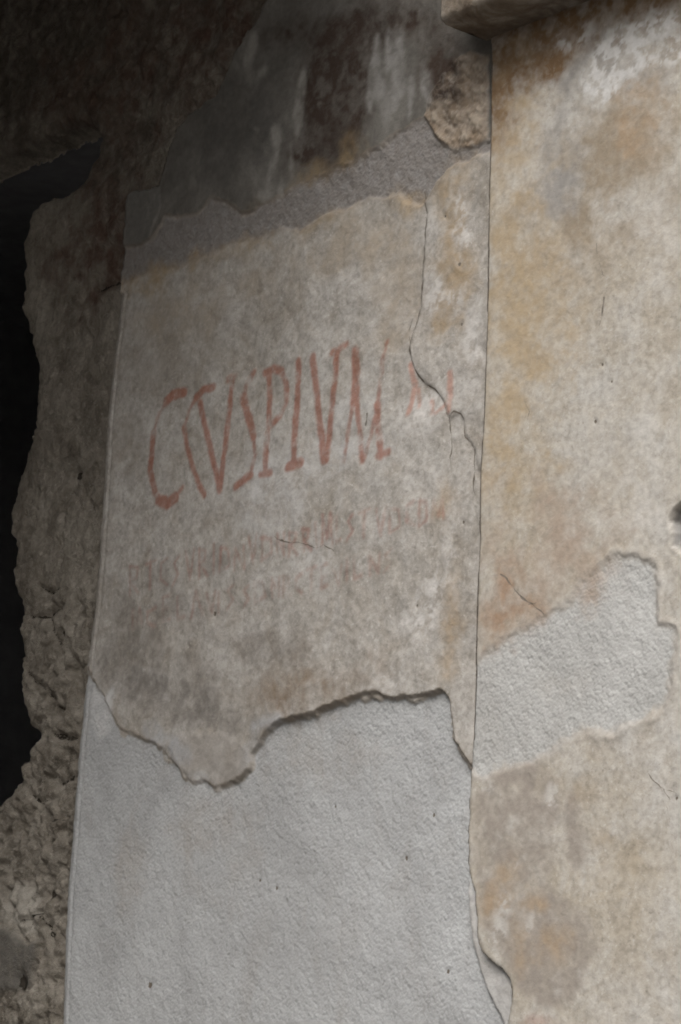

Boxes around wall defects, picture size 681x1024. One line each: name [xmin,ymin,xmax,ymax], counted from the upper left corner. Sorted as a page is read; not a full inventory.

crack [487,61,495,222]
crack [409,192,543,740]
spalling [0,664,512,1024]